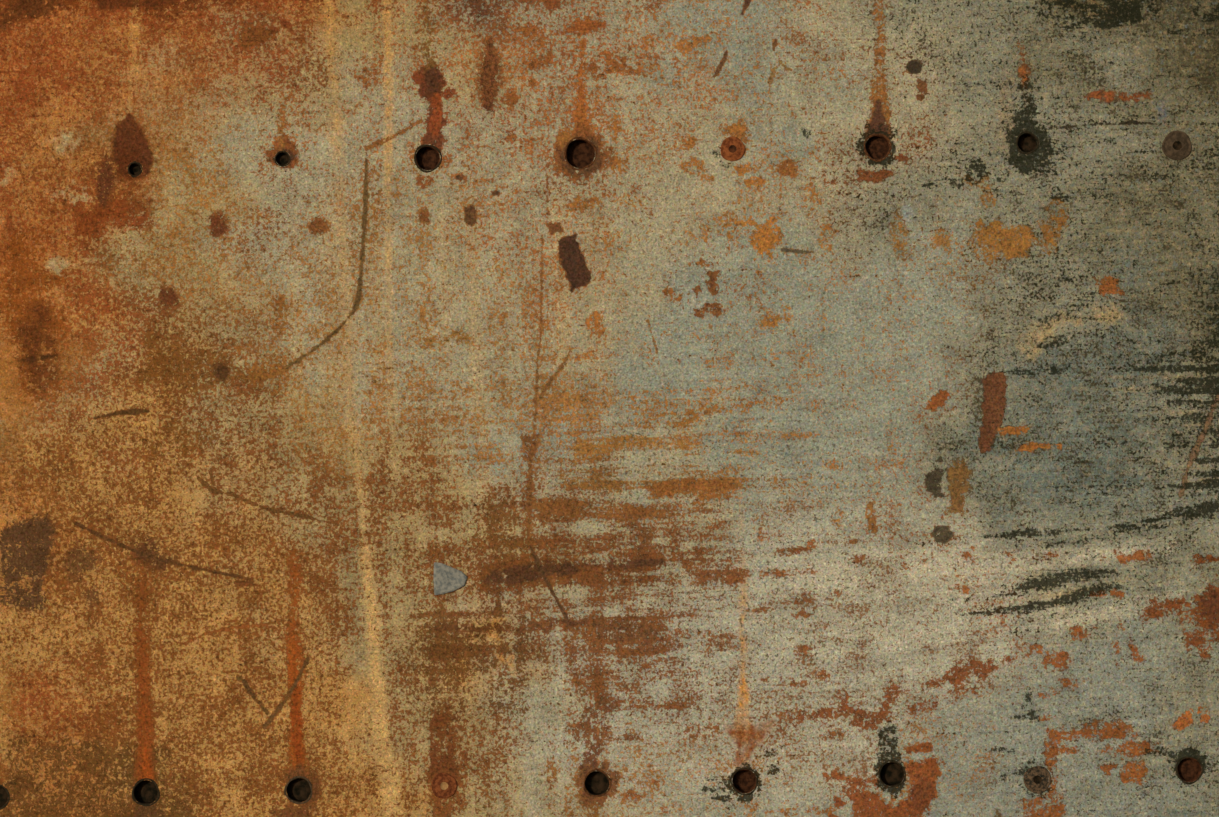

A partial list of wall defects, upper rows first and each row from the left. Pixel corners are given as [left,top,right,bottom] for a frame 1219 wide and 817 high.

corrosion [0,0,129,47]
corrosion [0,112,162,412]
corrosion [129,289,301,407]
corrosion [264,98,302,172]
corrosion [404,0,471,191]
corrosion [490,0,721,253]
corrosion [659,116,843,341]
corrosion [845,0,910,185]
corrosion [0,503,110,622]
corrosion [0,528,220,817]
corrosion [267,537,325,817]
corrosion [373,377,1219,817]